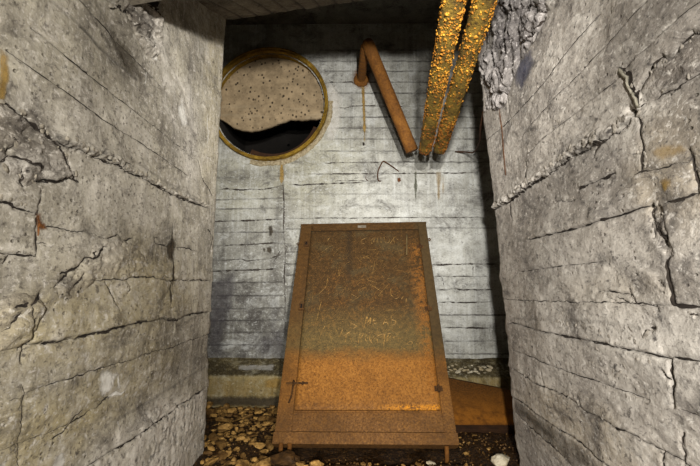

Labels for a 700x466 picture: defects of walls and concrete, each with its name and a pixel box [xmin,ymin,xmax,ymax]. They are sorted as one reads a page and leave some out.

spalling [478,0,547,111]
crack [0,0,700,321]
crack [3,337,206,466]
crack [19,310,209,362]
crack [513,354,690,466]
crack [512,322,700,416]